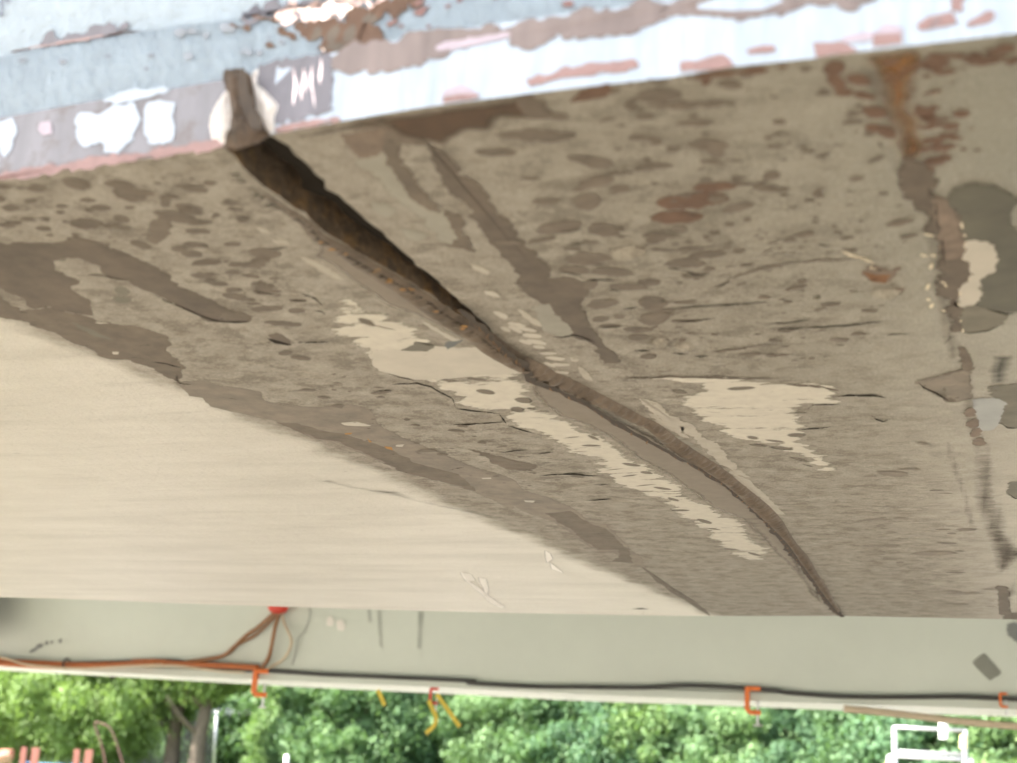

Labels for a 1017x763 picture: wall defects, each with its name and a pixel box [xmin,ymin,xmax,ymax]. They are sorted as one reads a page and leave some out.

peeling [74,86,176,154]
peeling [257,0,875,132]
peeling [566,79,886,284]
rust [679,54,788,86]
rust [747,45,775,54]
rust [813,23,973,343]
rust [917,0,989,31]
damp [319,245,460,336]
peeling [340,127,808,381]
peeling [947,182,1017,334]
damp [533,385,801,575]
peeling [626,375,842,515]